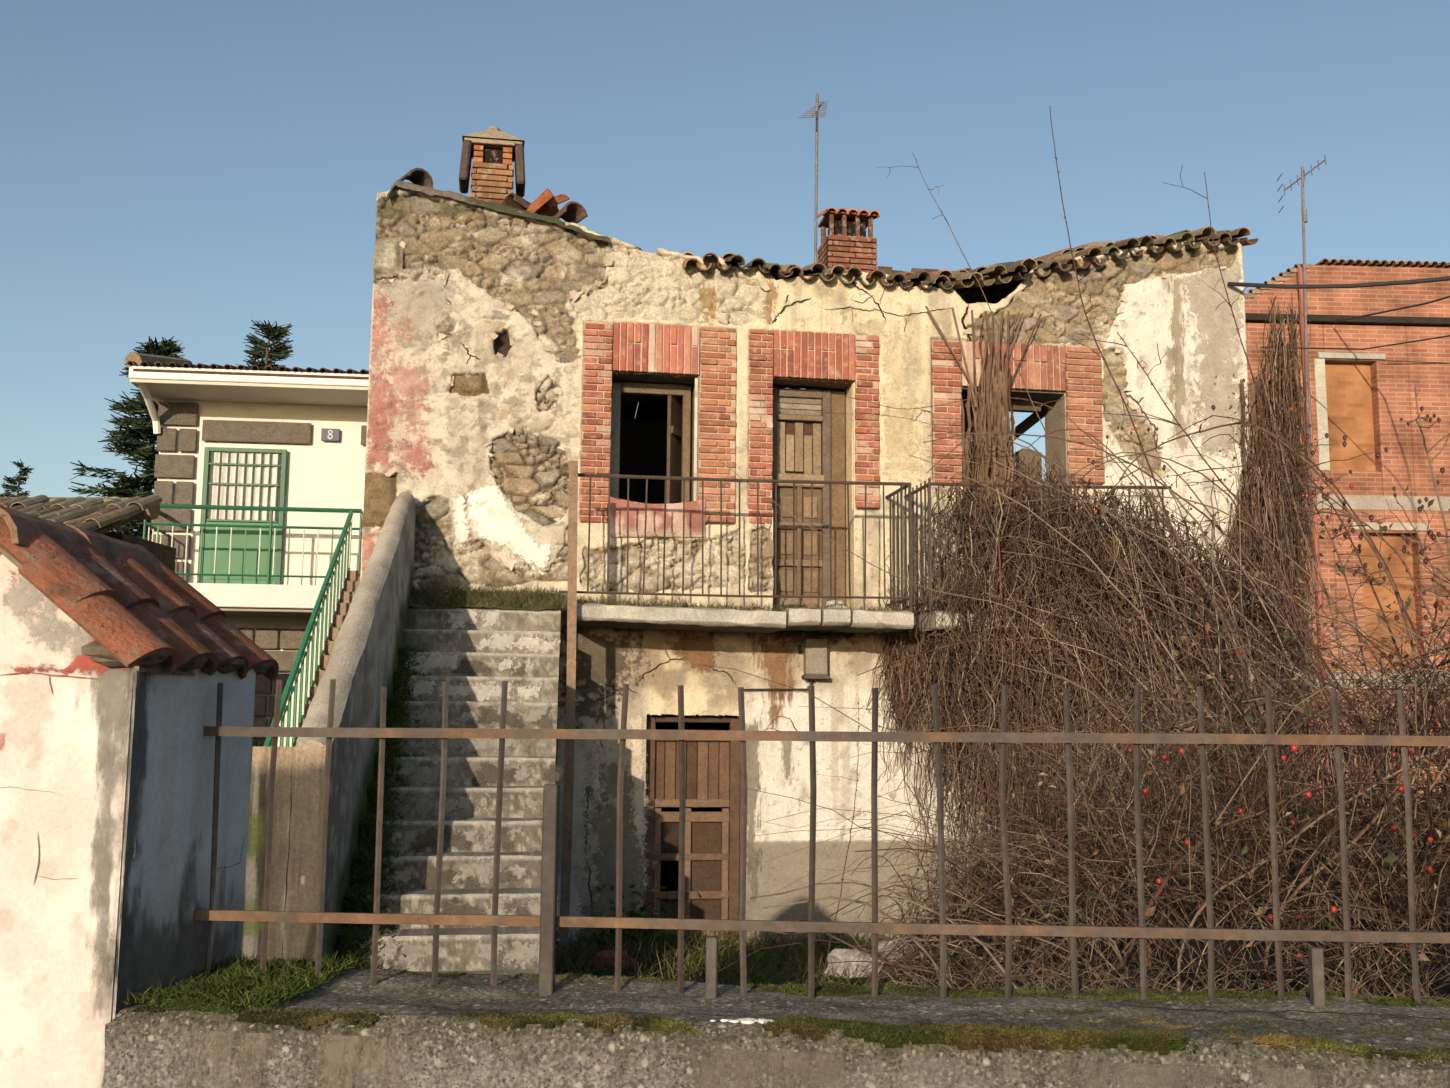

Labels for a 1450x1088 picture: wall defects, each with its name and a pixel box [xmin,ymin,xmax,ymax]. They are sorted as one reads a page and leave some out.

spalling [450,372,489,396]
spalling [536,376,563,412]
spalling [373,193,777,364]
spalling [963,245,1248,479]
water stain [1165,276,1187,452]
spalling [413,427,774,596]
peeling [11,639,127,675]
water stain [2,576,238,1014]
peeling [387,608,560,968]
peeling [571,727,604,870]
peeling [628,713,649,887]
peeling [356,935,433,967]